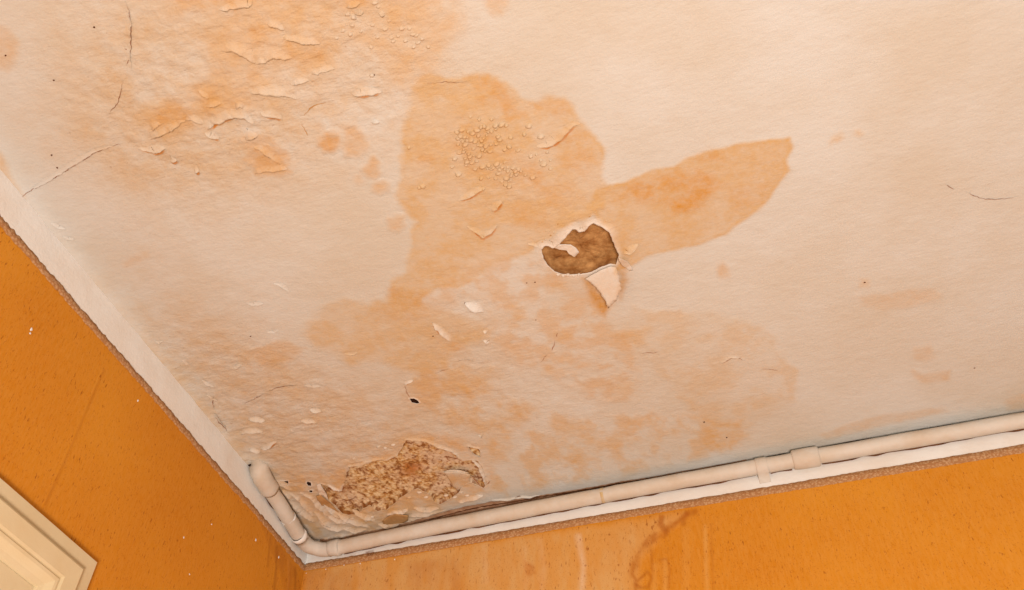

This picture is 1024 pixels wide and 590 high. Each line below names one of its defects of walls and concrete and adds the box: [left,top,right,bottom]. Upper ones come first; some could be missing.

crack [109,1,132,113]
peeling [223,19,320,64]
peeling [138,65,334,165]
crack [23,143,123,196]
leakage [117,0,804,500]
spalling [274,432,489,534]